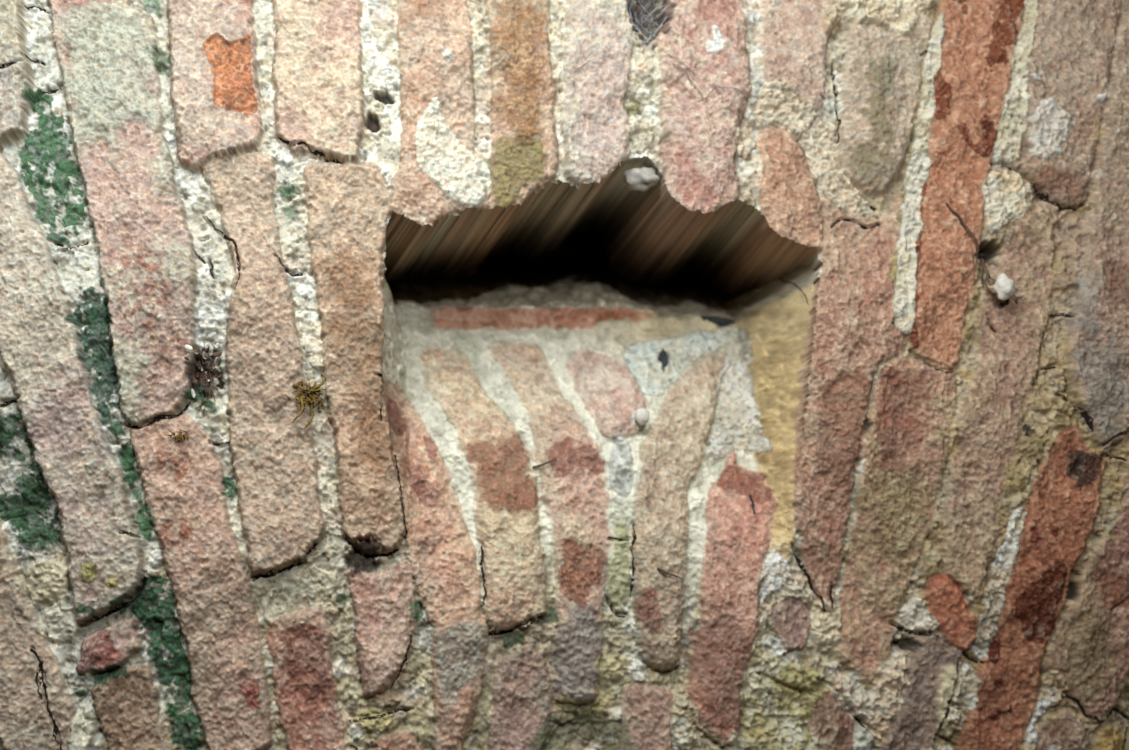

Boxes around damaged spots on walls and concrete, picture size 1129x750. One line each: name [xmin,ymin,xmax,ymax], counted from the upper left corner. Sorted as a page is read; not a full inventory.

spalling [623,167,660,192]
peeling [731,188,756,219]
spalling [701,316,735,326]
spalling [658,349,668,371]
spalling [387,399,406,435]
spalling [408,436,439,507]
spalling [545,437,605,477]